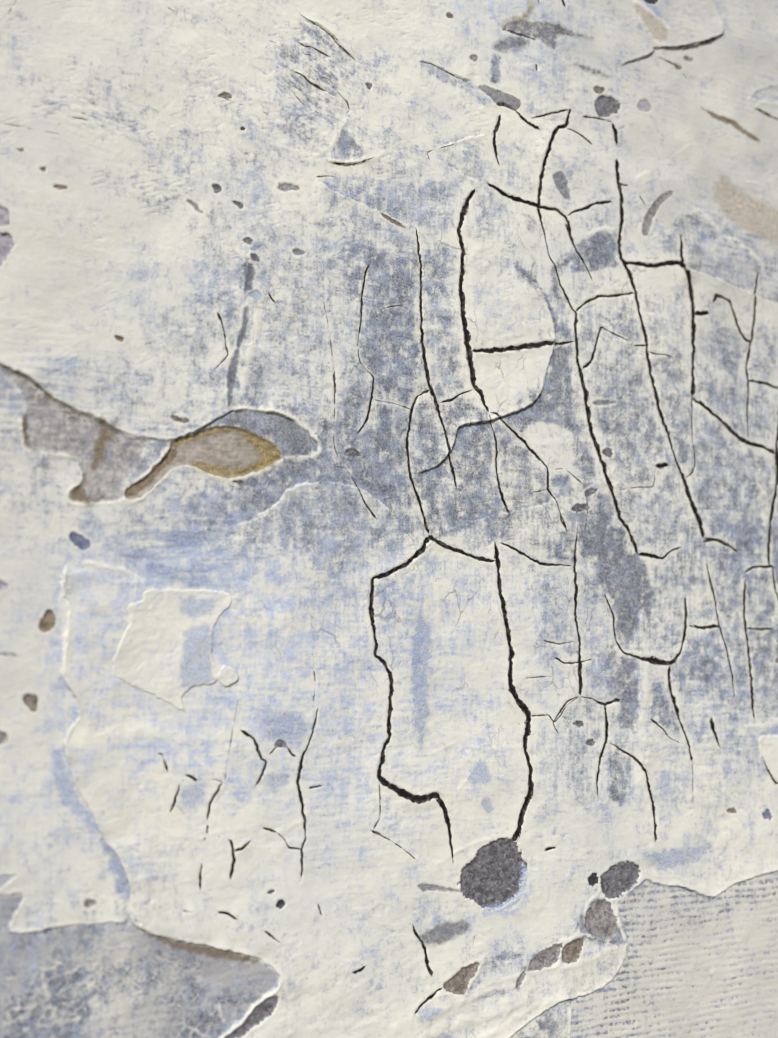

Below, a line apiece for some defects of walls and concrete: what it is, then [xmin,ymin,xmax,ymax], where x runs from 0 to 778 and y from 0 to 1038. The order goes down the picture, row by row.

peeling [8,370,144,503]
crack [323,102,778,860]
crack [157,664,322,912]
peeling [0,875,277,1038]
crack [217,911,238,920]
peeling [571,871,778,1038]